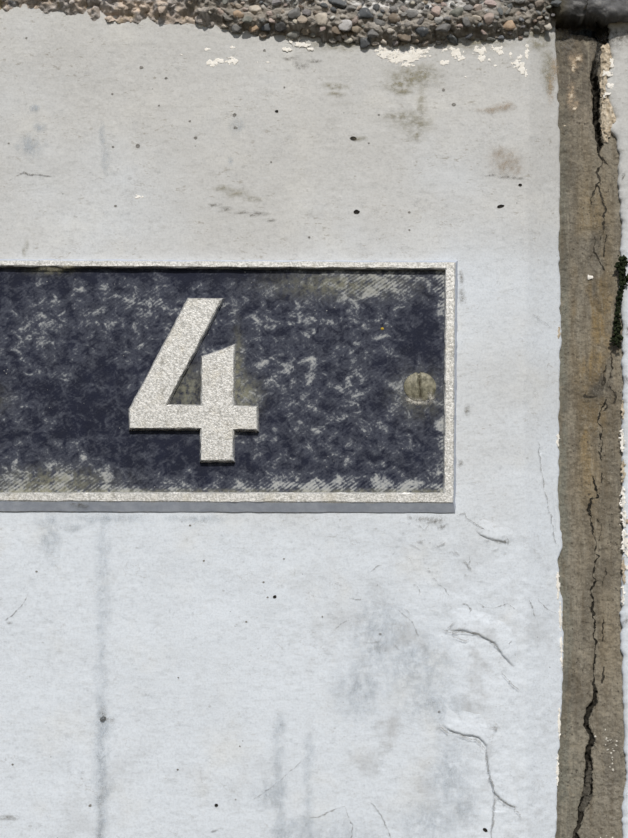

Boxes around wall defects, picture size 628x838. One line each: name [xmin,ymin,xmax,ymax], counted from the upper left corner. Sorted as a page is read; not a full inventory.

peeling [375,44,431,67]
peeling [440,44,530,77]
crack [583,0,624,270]
spalling [599,43,616,142]
crack [572,351,617,838]